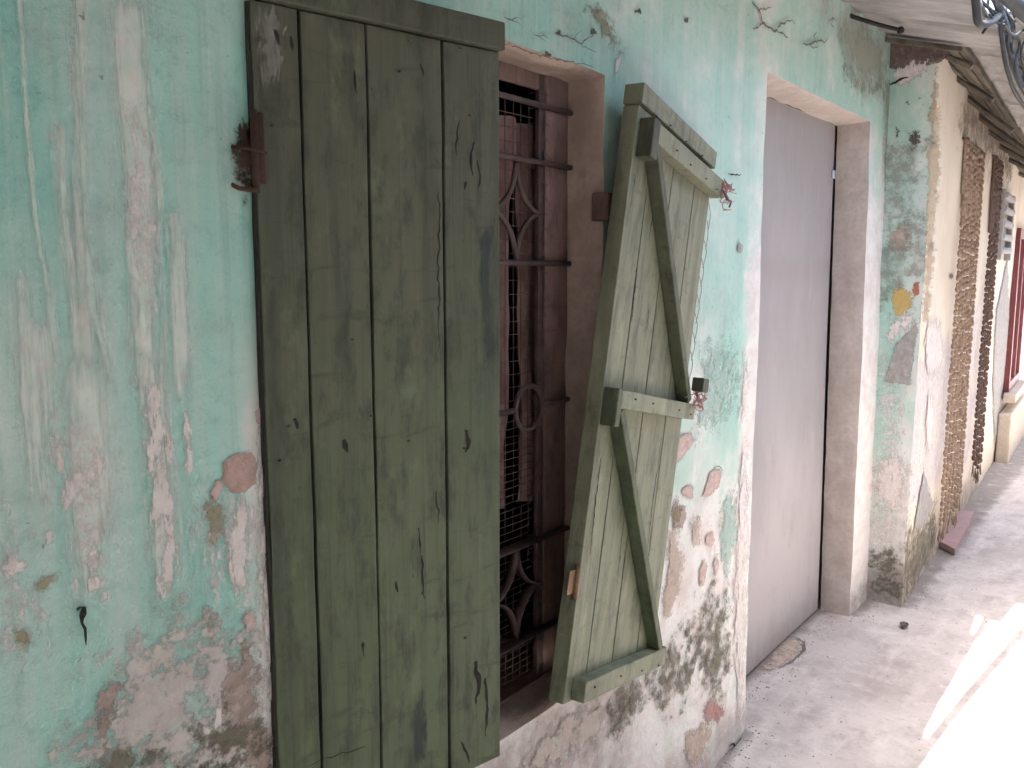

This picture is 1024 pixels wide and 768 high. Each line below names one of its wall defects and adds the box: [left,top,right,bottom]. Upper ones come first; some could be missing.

crack [504,17,595,68]
crack [752,2,835,48]
corrosion [232,120,252,204]
peeling [869,37,950,553]
peeling [1,550,47,651]
spalling [47,374,273,768]
peeling [661,451,751,725]
damp [868,500,938,602]
damp [607,579,733,737]